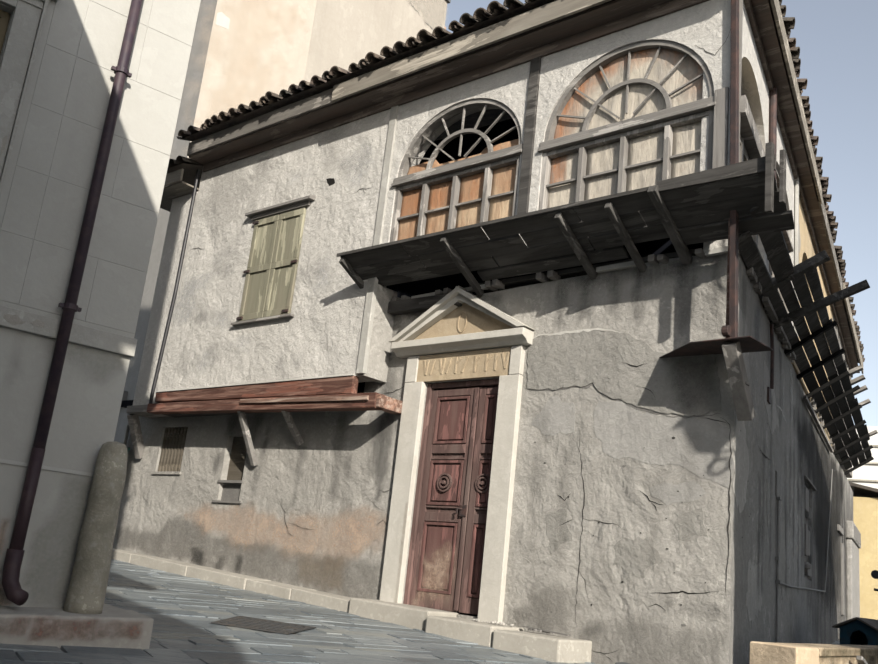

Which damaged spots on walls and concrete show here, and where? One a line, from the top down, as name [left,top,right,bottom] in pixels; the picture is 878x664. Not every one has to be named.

crack [558,429,620,621]
damp [817,511,845,605]